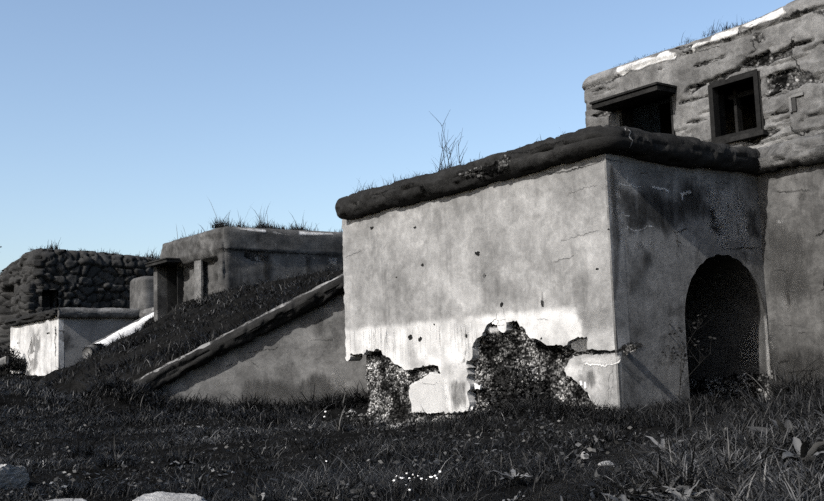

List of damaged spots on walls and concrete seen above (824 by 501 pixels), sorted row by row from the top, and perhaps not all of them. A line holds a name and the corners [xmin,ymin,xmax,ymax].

damp [610,168,758,251]
spalling [365,322,637,425]